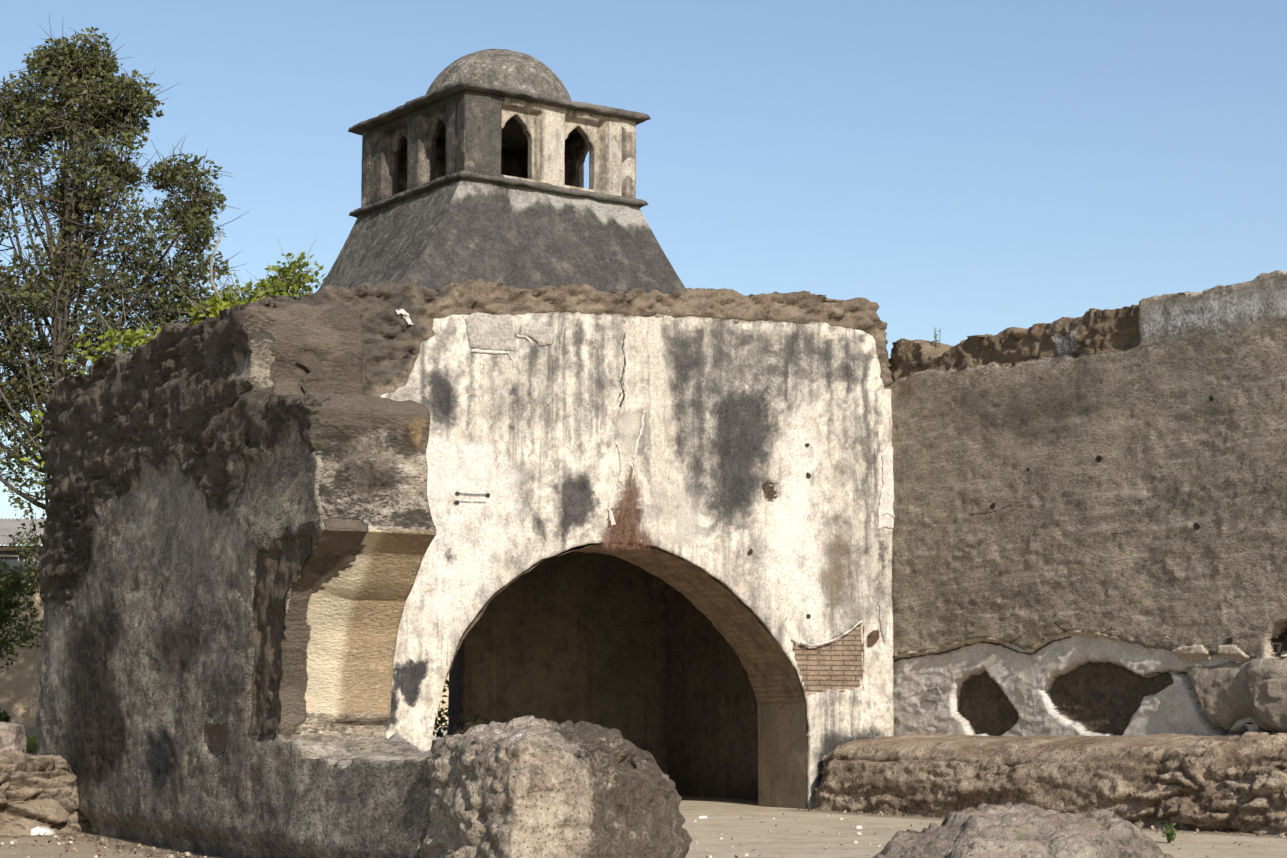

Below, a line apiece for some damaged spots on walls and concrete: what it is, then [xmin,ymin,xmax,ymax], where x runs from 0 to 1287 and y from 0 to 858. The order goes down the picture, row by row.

flaking render [1143,280,1287,340]
damp [425,347,474,425]
damp [510,346,535,406]
damp [575,319,583,386]
damp [648,318,769,540]
damp [783,335,879,484]
damp [533,475,600,538]
rust [603,470,652,549]
flaking render [878,445,895,576]
damp [386,659,427,730]
spalling [791,604,1259,737]